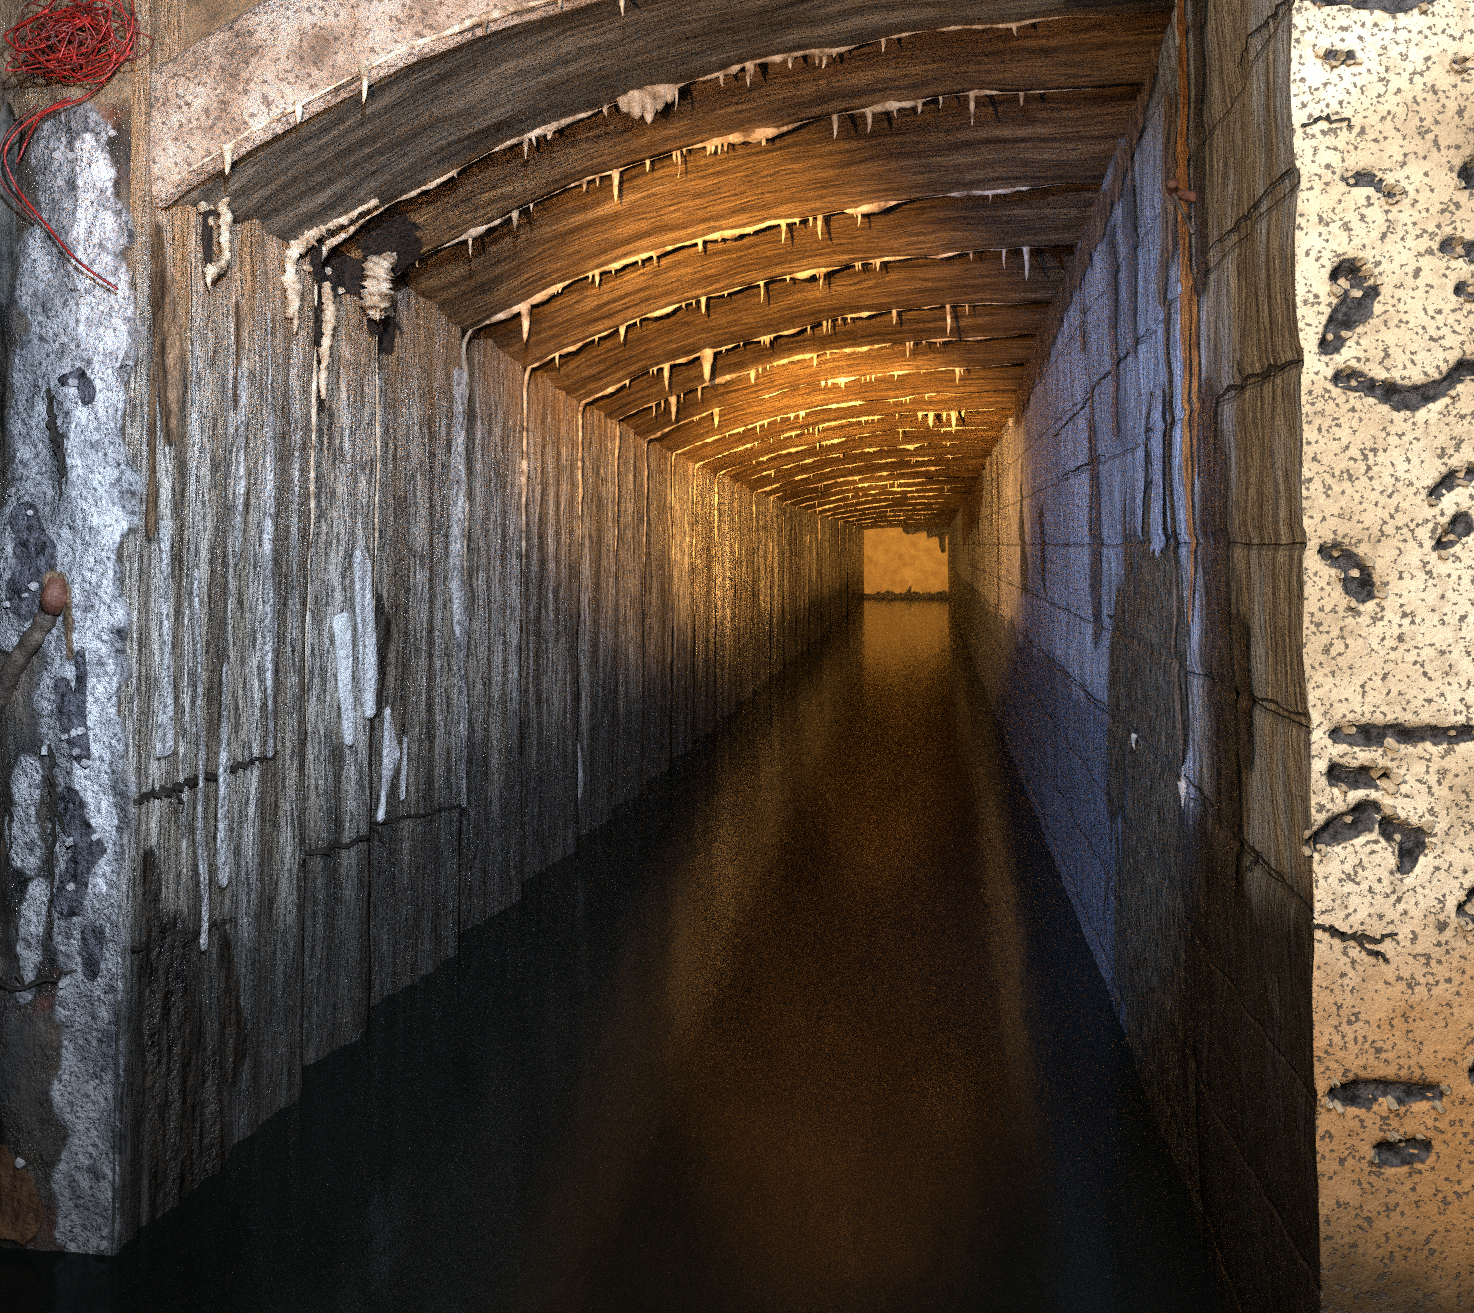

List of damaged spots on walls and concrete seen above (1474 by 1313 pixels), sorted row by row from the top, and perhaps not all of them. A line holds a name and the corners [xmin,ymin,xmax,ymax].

leakage [145,221,182,757]
leakage [234,297,246,564]
efflorescence [170,0,562,184]
leakage [264,15,1118,823]
rust [1175,0,1200,623]
crack [1200,359,1298,404]
crack [1208,168,1292,252]
crack [1237,0,1287,68]
leakage [137,569,250,1231]